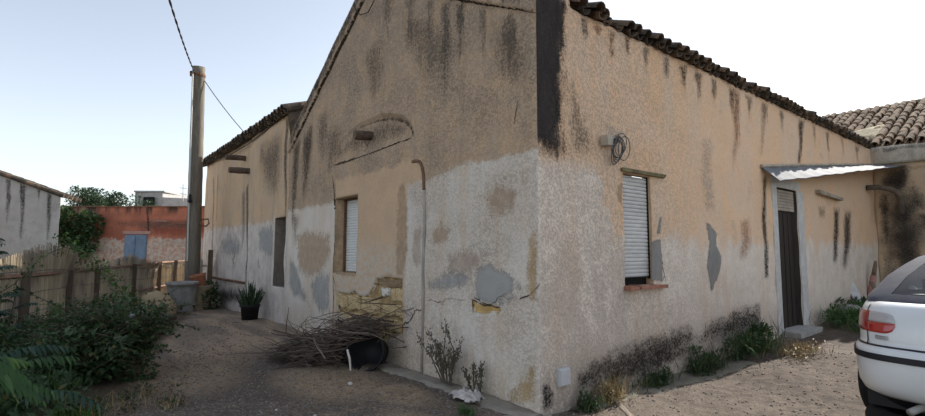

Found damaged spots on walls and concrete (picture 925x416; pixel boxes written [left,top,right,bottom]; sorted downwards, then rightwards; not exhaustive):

damp [262,0,357,211]
damp [441,2,464,75]
damp [536,0,567,157]
flaking render [335,185,407,341]
damp [833,209,851,265]
damp [881,167,925,266]
crack [404,284,540,324]
flaking render [472,299,501,313]
damp [578,307,761,388]